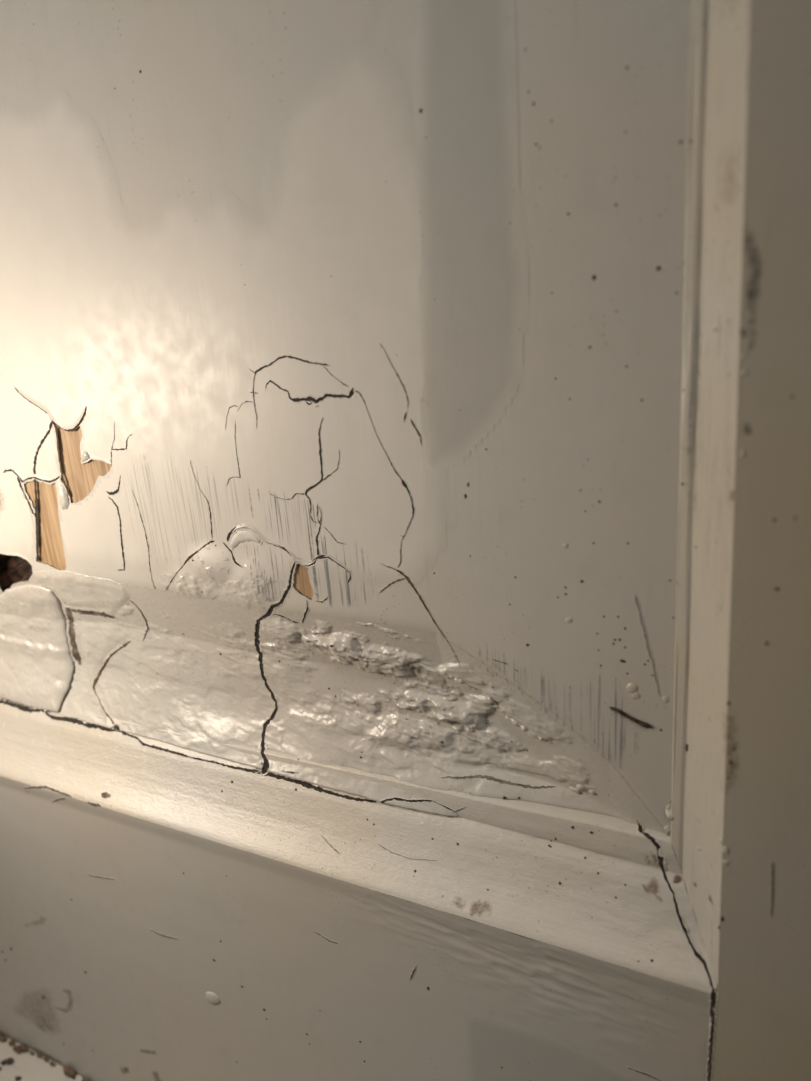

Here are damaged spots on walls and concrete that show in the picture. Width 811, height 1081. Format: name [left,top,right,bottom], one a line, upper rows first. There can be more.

peeling [0,385,131,712]
crack [0,343,556,812]
peeling [231,523,351,600]
crack [636,818,719,1081]